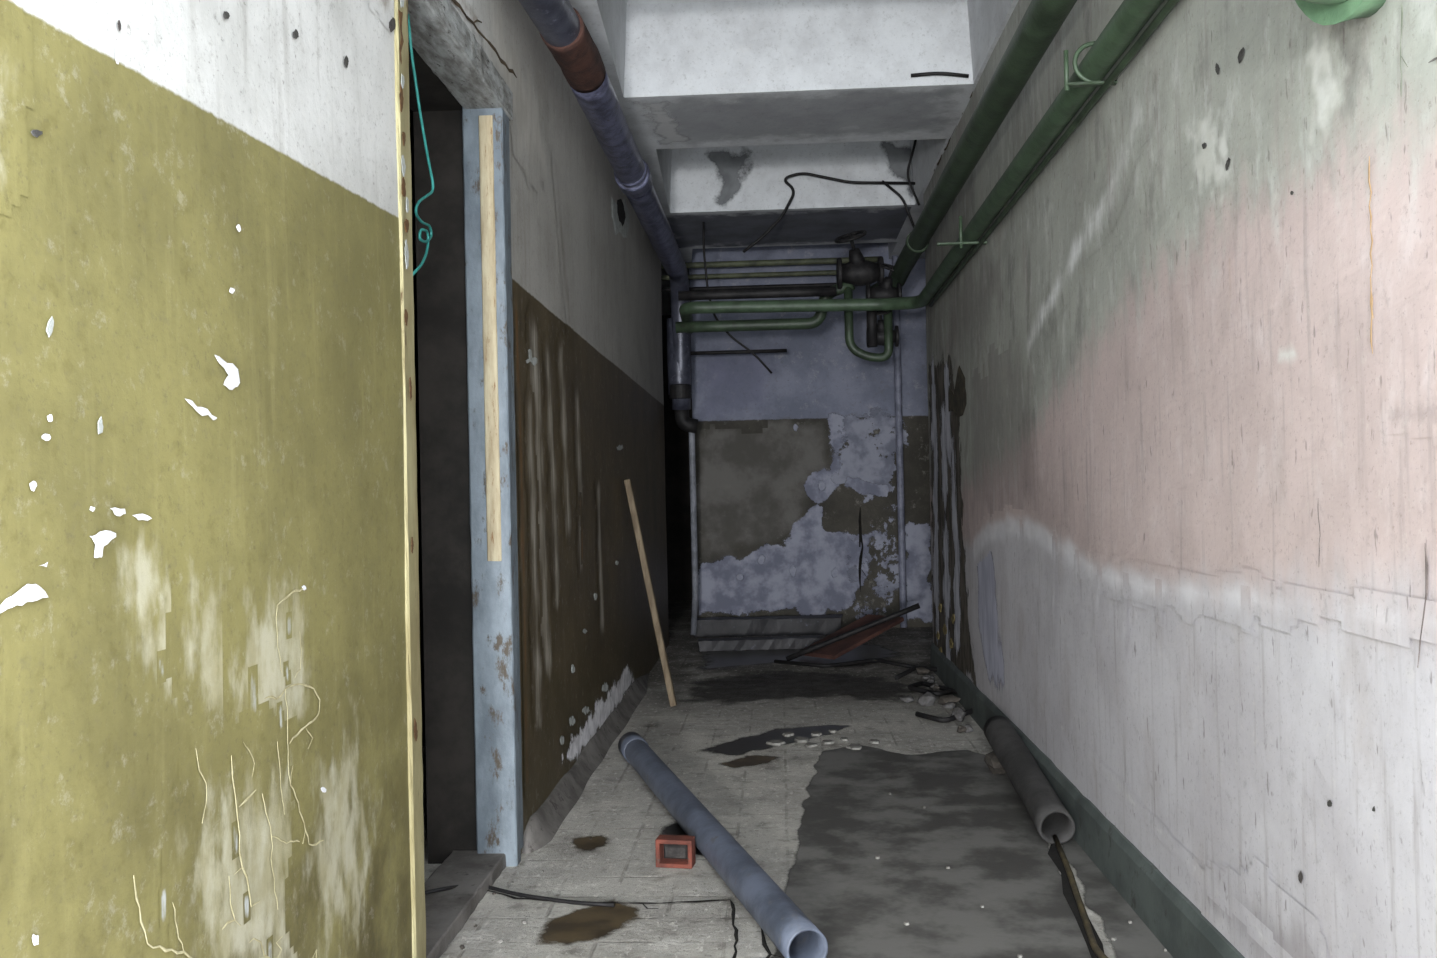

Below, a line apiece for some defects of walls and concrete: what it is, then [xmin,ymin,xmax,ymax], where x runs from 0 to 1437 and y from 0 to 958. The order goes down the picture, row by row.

corrosion [540,8,606,93]
crack [1400,3,1437,91]
peeling [46,316,54,337]
peeling [215,355,240,390]
peeling [185,399,217,420]
damp [524,146,606,742]
peeling [90,506,152,558]
peeling [698,354,976,686]
damp [277,660,291,733]
damp [159,883,169,929]
damp [243,891,251,924]